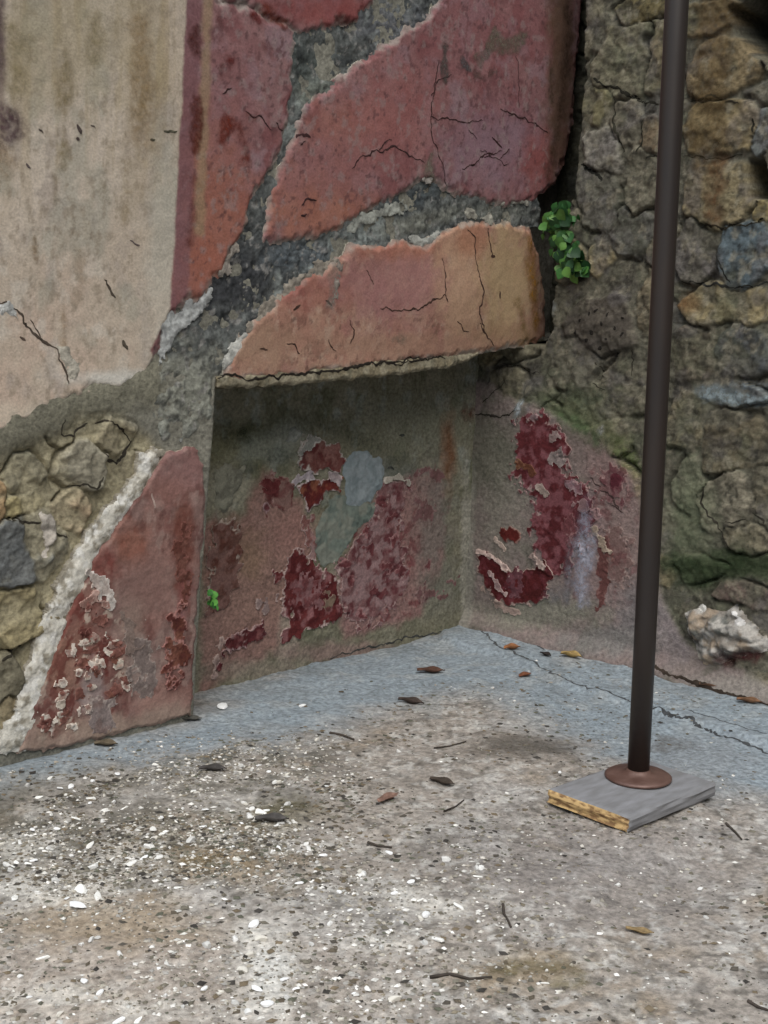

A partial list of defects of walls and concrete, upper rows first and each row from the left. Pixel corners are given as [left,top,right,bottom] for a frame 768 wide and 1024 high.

spalling [287,0,439,125]
crack [0,301,80,386]
crack [152,58,548,442]
spalling [0,446,244,755]
flaking render [211,433,460,680]
flaking render [475,408,636,616]
crack [481,631,768,754]